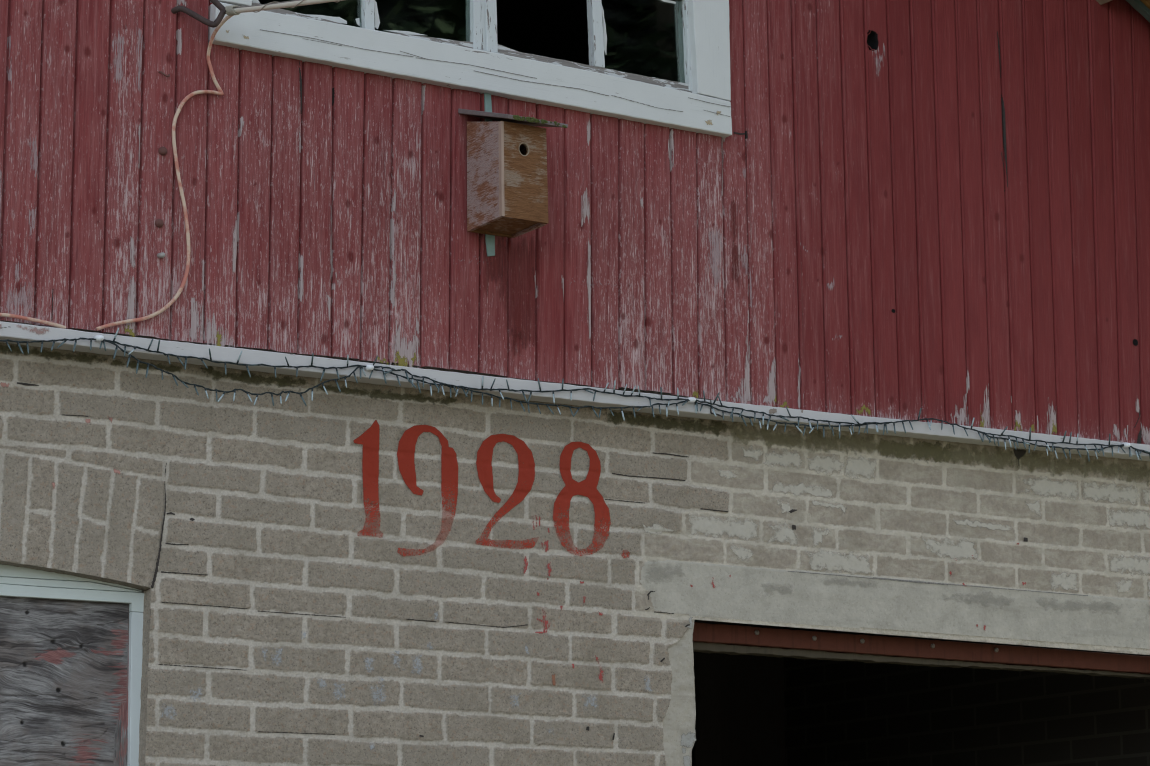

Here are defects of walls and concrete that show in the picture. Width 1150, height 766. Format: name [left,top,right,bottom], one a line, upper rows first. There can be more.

peeling [112,29,143,92]
peeling [581,188,590,227]
peeling [6,261,34,324]
peeling [125,236,136,333]
peeling [232,212,240,273]
peeling [327,247,338,320]
peeling [389,190,420,367]
peeling [708,228,723,288]
peeling [731,246,778,414]
peeling [950,371,991,428]
peeling [1011,396,1057,435]
peeling [1113,398,1150,445]